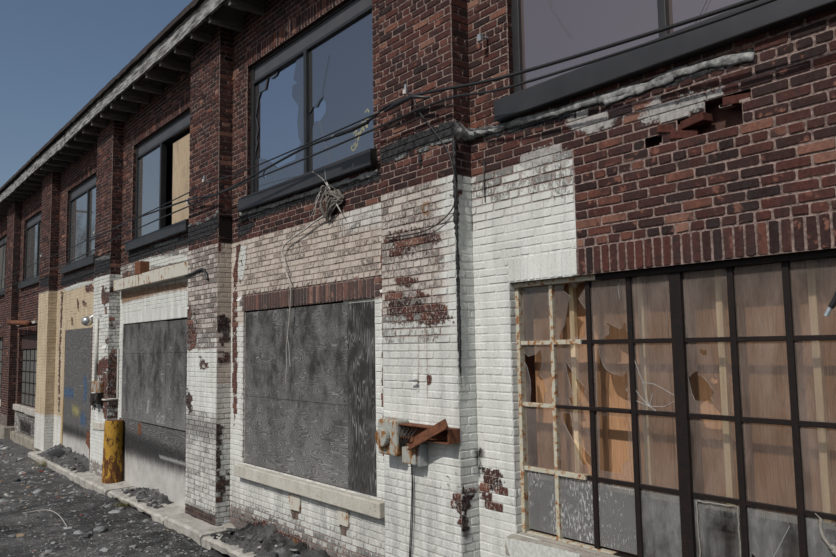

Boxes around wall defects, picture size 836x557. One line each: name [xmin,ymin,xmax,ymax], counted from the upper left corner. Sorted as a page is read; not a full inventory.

peeling [58,280,118,419]
peeling [182,305,209,370]
peeling [215,244,247,503]
peeling [380,226,454,418]
peeling [446,467,508,538]